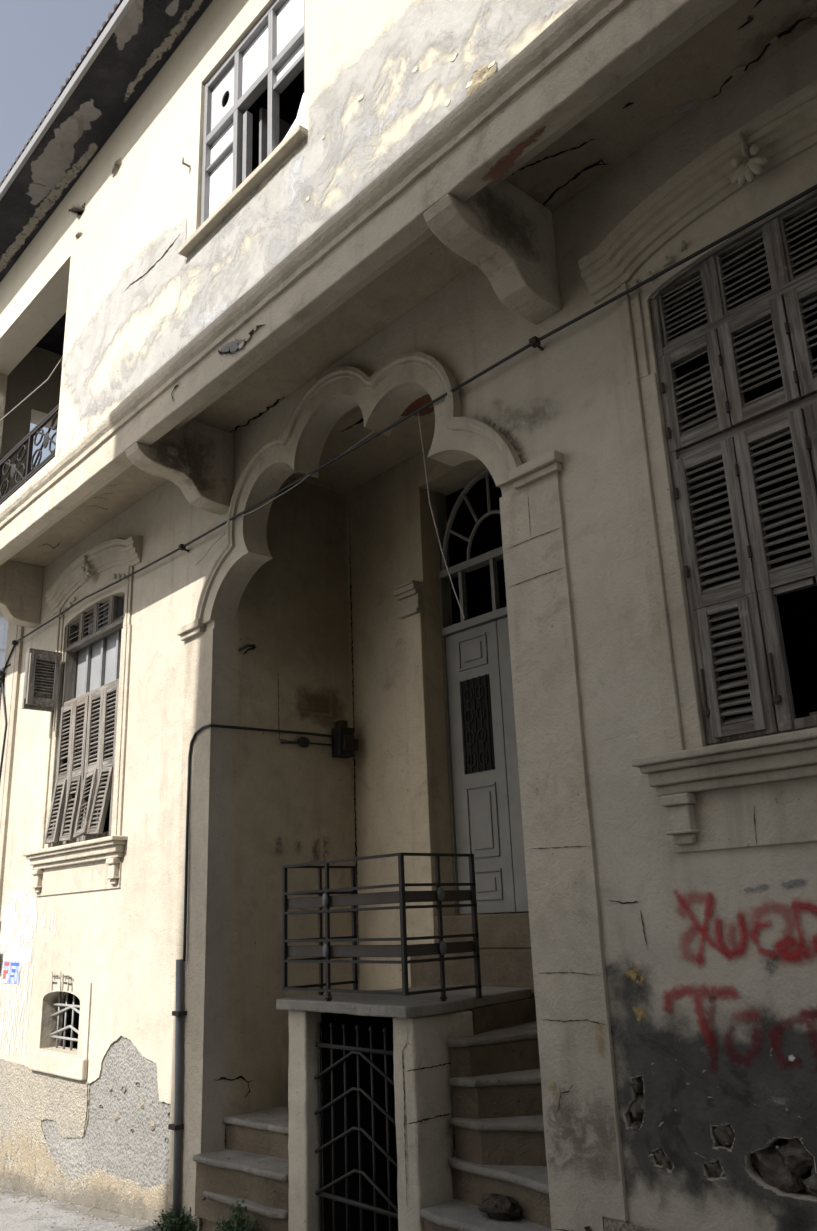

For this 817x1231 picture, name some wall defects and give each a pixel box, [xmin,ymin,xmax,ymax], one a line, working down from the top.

crack [705,0,817,104]
crack [512,139,608,206]
peeling [62,0,576,432]
crack [127,233,181,288]
flaking render [43,1036,171,1194]
flaking render [628,1076,644,1129]
damp [551,965,817,1231]
flaking render [706,1124,735,1178]
flaking render [744,1138,817,1202]